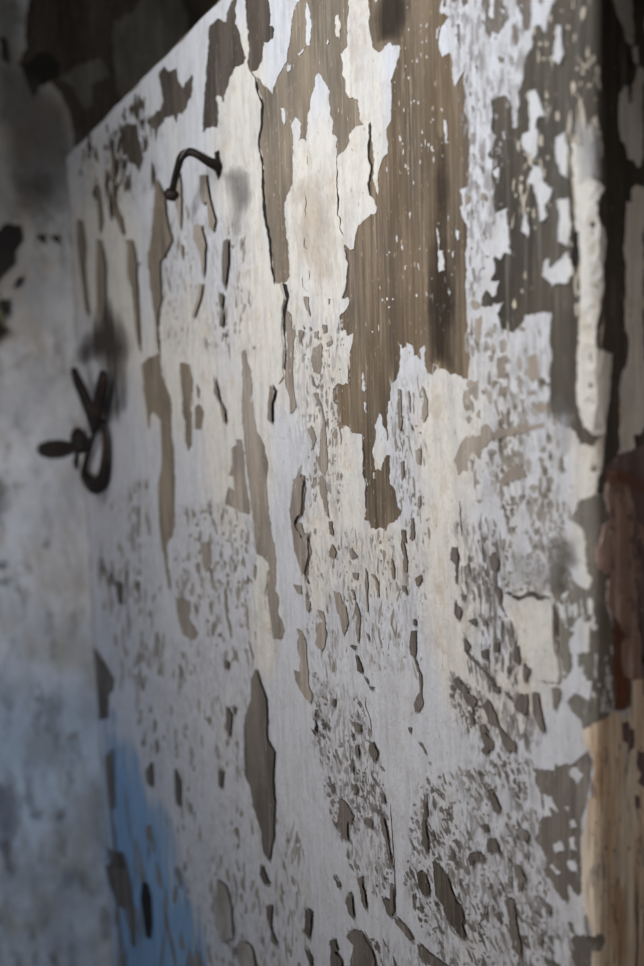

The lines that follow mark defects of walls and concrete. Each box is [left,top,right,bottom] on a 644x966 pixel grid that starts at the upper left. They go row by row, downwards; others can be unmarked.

peeling [0,0,312,966]
peeling [202,0,644,966]